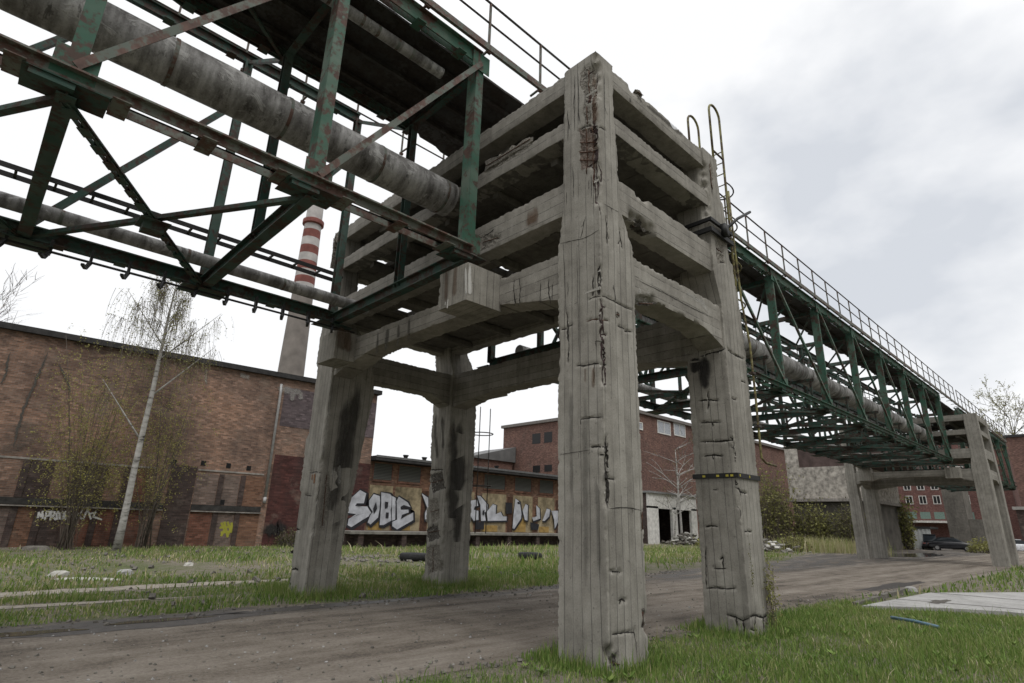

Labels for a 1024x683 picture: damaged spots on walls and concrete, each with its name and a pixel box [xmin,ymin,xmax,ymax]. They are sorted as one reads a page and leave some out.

spalling [578,66,599,186]
spalling [629,219,650,236]
leakage [691,358,710,388]
leakage [330,393,359,508]
leakage [434,419,465,542]
crack [700,349,750,589]
crack [729,614,767,631]